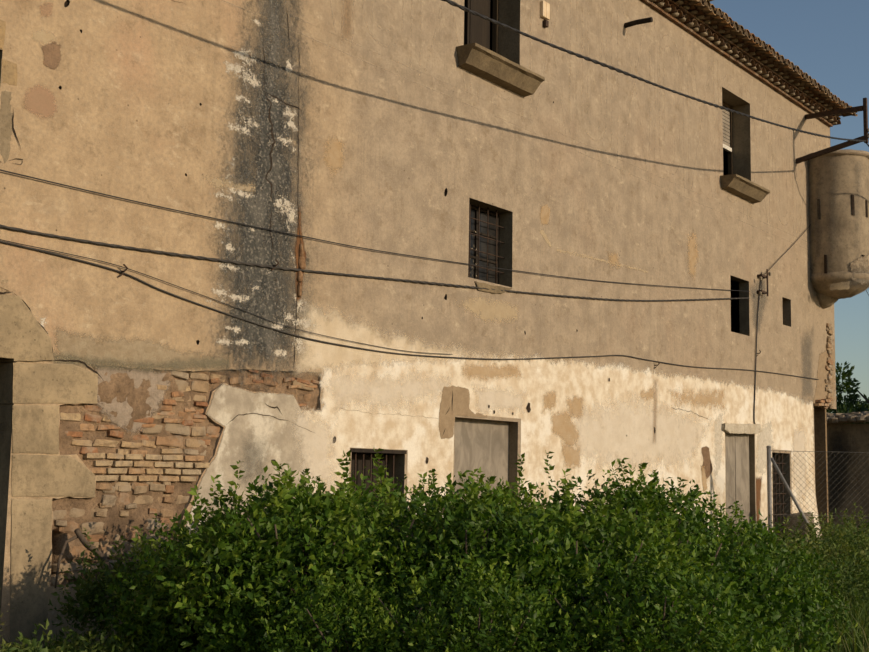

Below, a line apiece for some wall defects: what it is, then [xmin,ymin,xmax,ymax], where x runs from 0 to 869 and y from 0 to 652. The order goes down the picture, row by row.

water stain [165,0,321,374]
crack [263,8,302,262]
corrosion [295,212,306,301]
crack [213,404,312,432]
peeling [50,323,835,588]